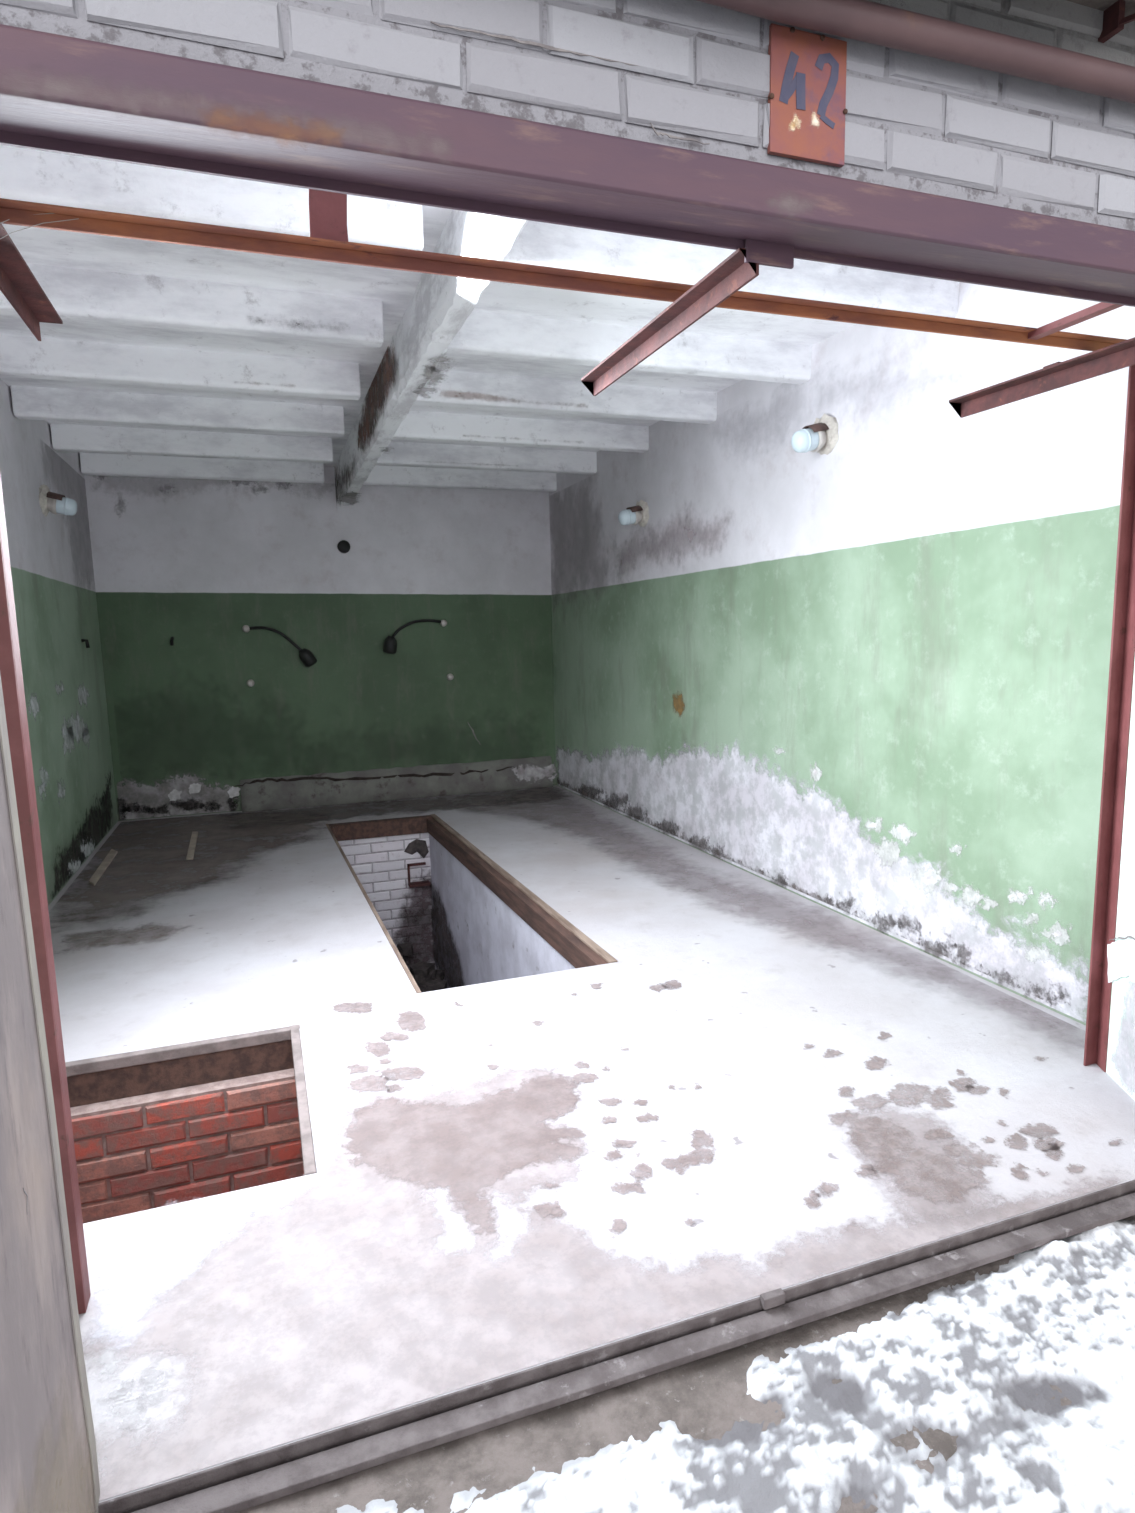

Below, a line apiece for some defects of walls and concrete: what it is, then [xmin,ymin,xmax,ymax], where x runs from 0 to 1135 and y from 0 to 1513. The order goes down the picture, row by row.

peeling [117,770,240,820]
water stain [52,773,1072,1029]
corrosion [673,694,685,716]
peeling [512,743,1089,1022]
flaking render [1107,936,1135,1094]
water stain [83,1010,1117,1501]